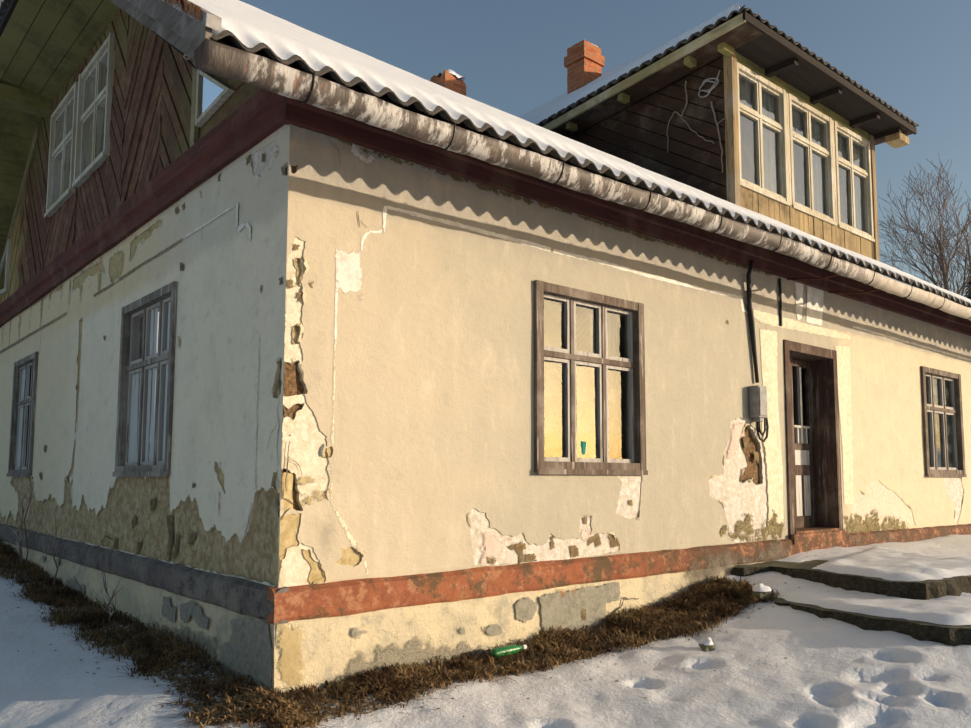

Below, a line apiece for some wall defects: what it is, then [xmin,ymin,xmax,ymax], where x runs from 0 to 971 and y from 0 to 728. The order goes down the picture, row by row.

flaking render [245,141,297,180]
flaking render [72,220,162,294]
flaking render [0,237,332,587]
flaking render [613,475,642,521]
flaking render [708,418,768,543]
flaking render [851,480,915,525]
flaking render [337,547,365,566]
flaking render [466,508,620,566]